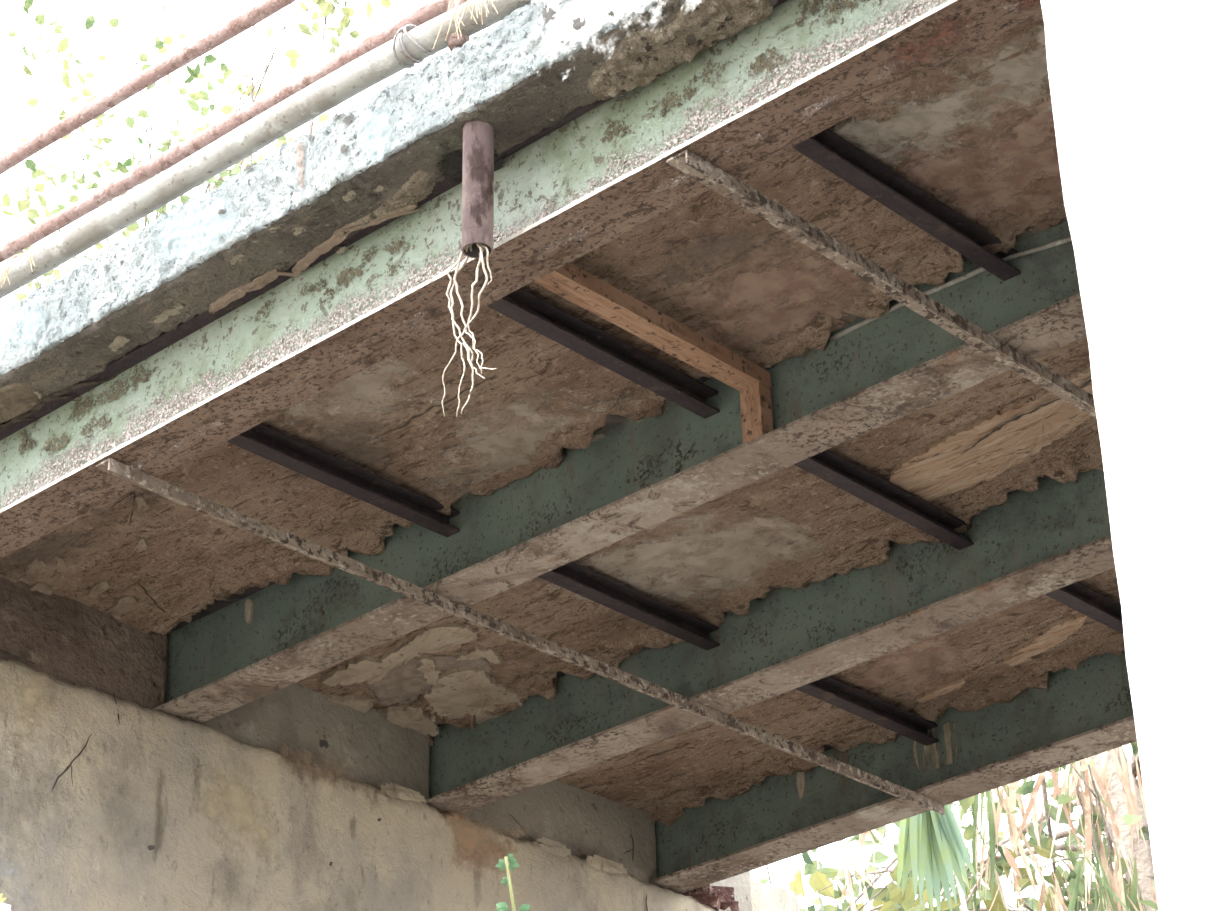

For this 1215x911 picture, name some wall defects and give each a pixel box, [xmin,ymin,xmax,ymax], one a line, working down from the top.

spalling [587,0,773,101]
rust [493,0,949,244]
rust [902,97,1065,234]
rust [0,236,470,509]
spalling [322,623,524,737]
rust [830,636,960,693]